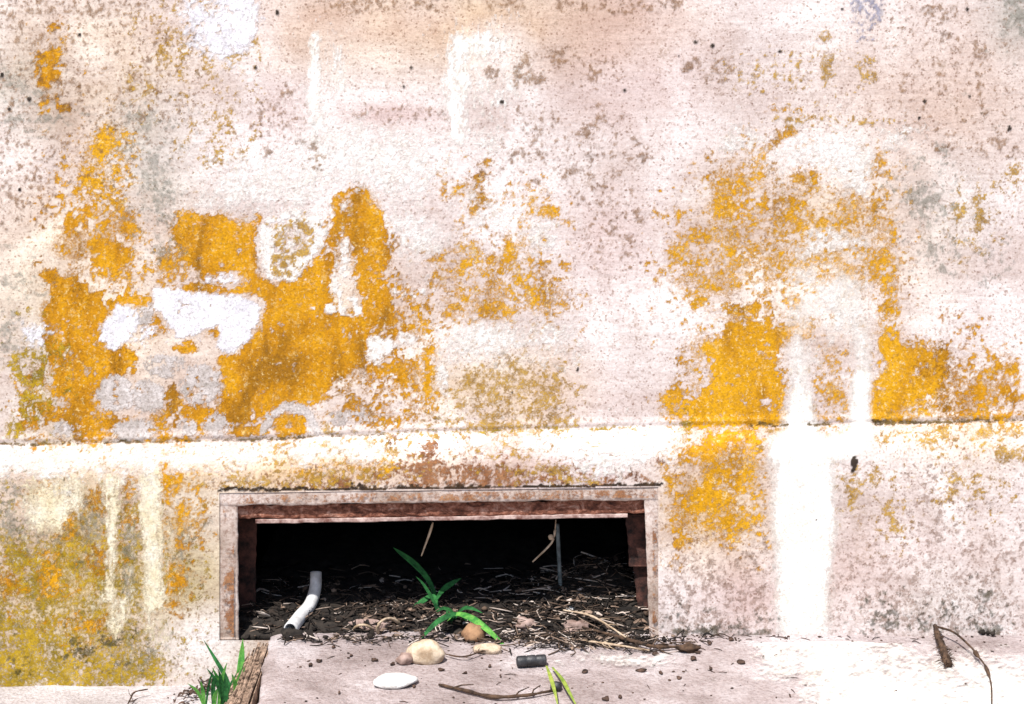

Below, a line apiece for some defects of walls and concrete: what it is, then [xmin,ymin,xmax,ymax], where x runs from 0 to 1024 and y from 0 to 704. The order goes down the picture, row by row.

peeling [22,322,63,347]
peeling [98,272,265,355]